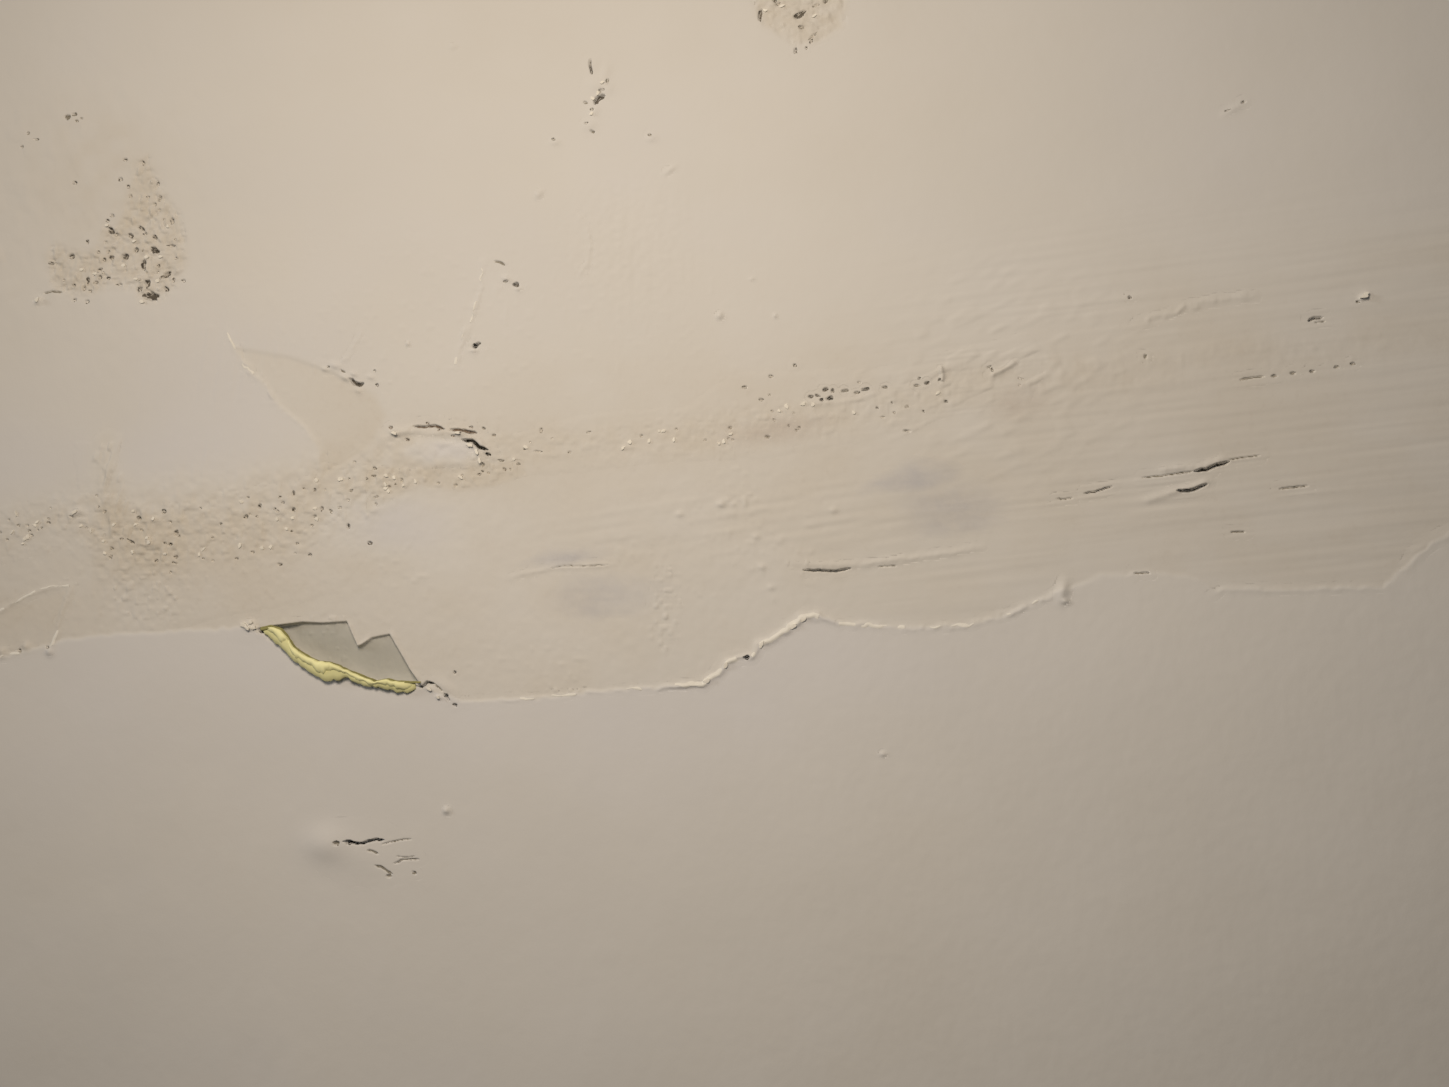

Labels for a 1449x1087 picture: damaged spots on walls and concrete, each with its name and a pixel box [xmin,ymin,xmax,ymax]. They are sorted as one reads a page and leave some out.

spalling [752,0,850,60]
spalling [32,152,192,310]
crack [1046,446,1318,541]
peeling [239,614,463,713]